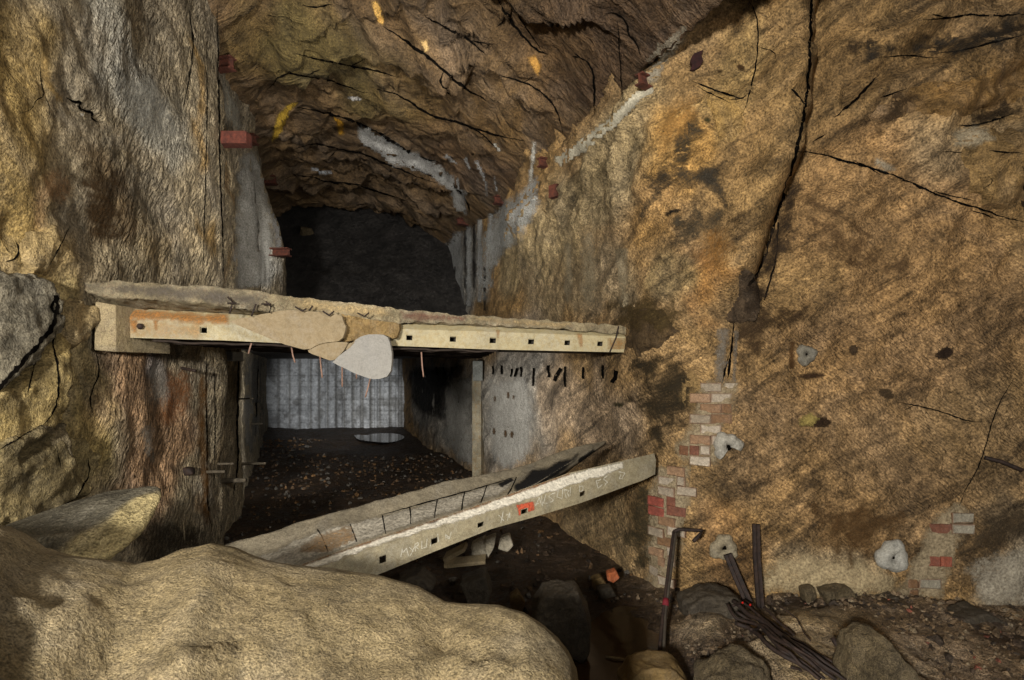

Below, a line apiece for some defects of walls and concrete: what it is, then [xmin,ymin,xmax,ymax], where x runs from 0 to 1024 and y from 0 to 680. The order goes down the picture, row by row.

crack [22,70,98,122]
crack [692,0,776,115]
leakage [359,127,498,213]
crack [748,0,1024,300]
crack [0,295,60,449]
corrosion [130,310,228,335]
leakage [447,214,493,311]
leakage [607,250,682,332]
crack [722,322,735,383]
flaking render [646,373,738,589]
crack [899,380,1013,506]
flaking render [900,503,975,597]